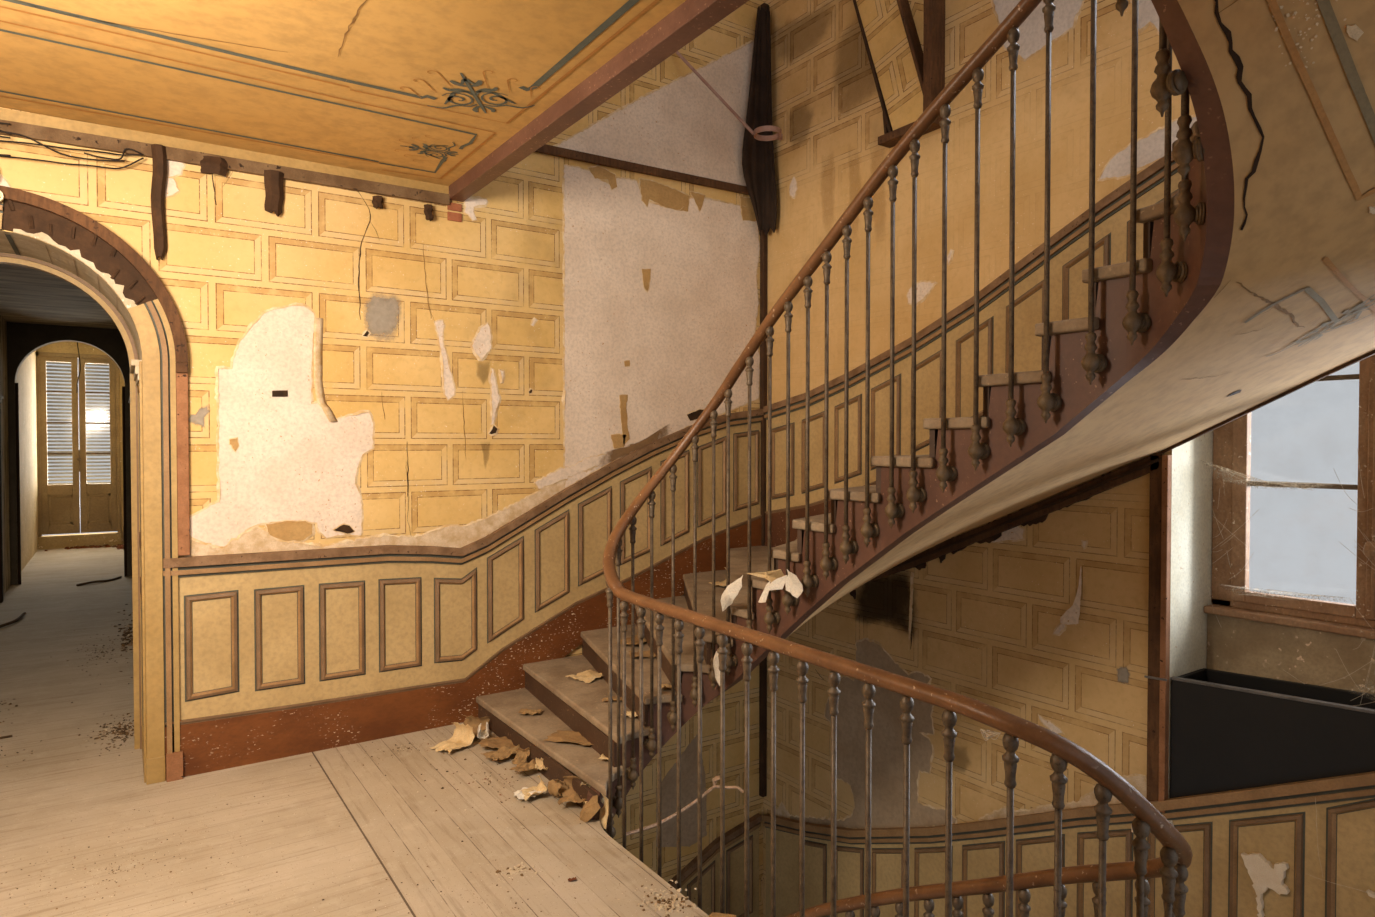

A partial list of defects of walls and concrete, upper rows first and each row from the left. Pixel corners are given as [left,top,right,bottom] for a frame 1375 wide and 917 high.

peeling [991,0,1085,62]
peeling [1130,0,1159,35]
peeling [1097,114,1197,181]
crack [1214,0,1264,230]
peeling [184,39,760,557]
peeling [1241,852,1290,917]